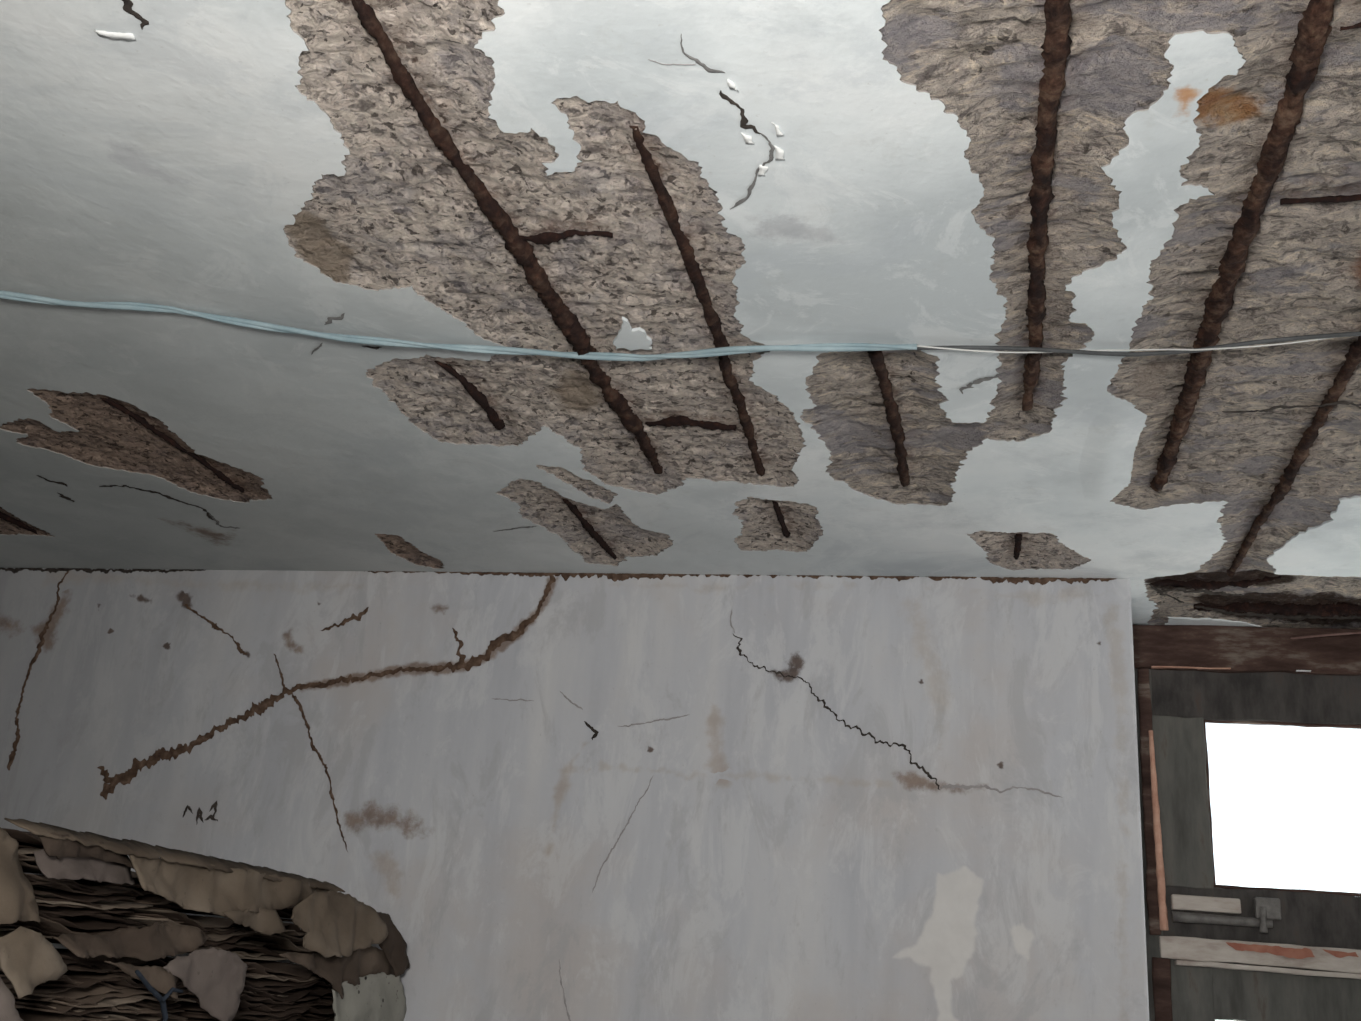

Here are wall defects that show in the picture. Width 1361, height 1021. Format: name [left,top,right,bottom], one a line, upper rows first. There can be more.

crack [648,34,785,209]
rust [1154,78,1282,136]
spalling [285,0,1361,628]
spalling [0,388,272,502]
rust [1145,565,1361,629]
crack [0,568,1361,852]
peeling [888,863,987,1021]